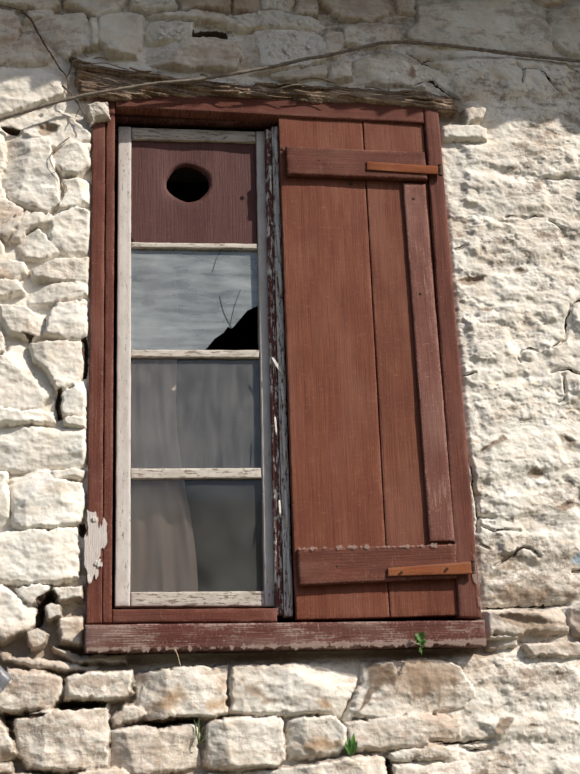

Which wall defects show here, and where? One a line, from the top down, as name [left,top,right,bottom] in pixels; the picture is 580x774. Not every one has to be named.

crack [409,55,452,97]
crack [518,300,580,362]
peeling [272,357,284,404]
peeling [274,417,286,464]
peeling [279,489,288,525]
crack [470,466,539,566]
peeling [84,510,107,585]
peeling [188,637,487,651]